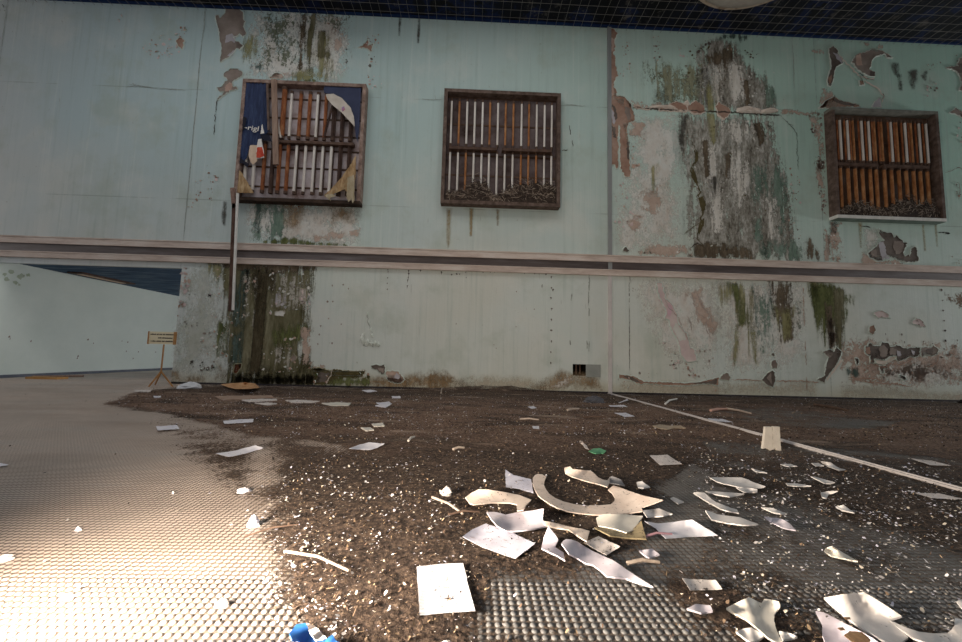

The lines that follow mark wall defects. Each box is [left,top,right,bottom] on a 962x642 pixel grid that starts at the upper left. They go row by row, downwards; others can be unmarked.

peeling [215,9,247,101]
leakage [243,11,353,81]
peeling [611,28,697,257]
leakage [645,34,820,261]
peeling [782,43,893,262]
peeling [862,229,919,264]
leakage [208,263,316,385]
leakage [719,281,794,363]
peeling [202,281,962,642]